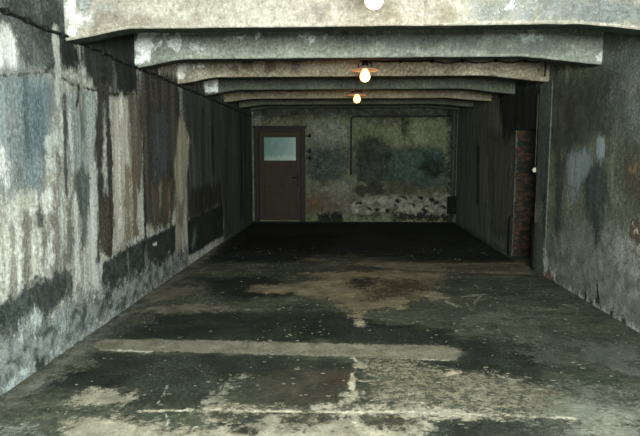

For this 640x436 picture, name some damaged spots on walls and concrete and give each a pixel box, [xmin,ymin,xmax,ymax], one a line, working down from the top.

peeling [310,116,355,151]
damp [606,33,640,153]
damp [0,0,563,394]
spalling [311,176,450,218]
damp [540,125,640,330]
damp [431,408,555,436]